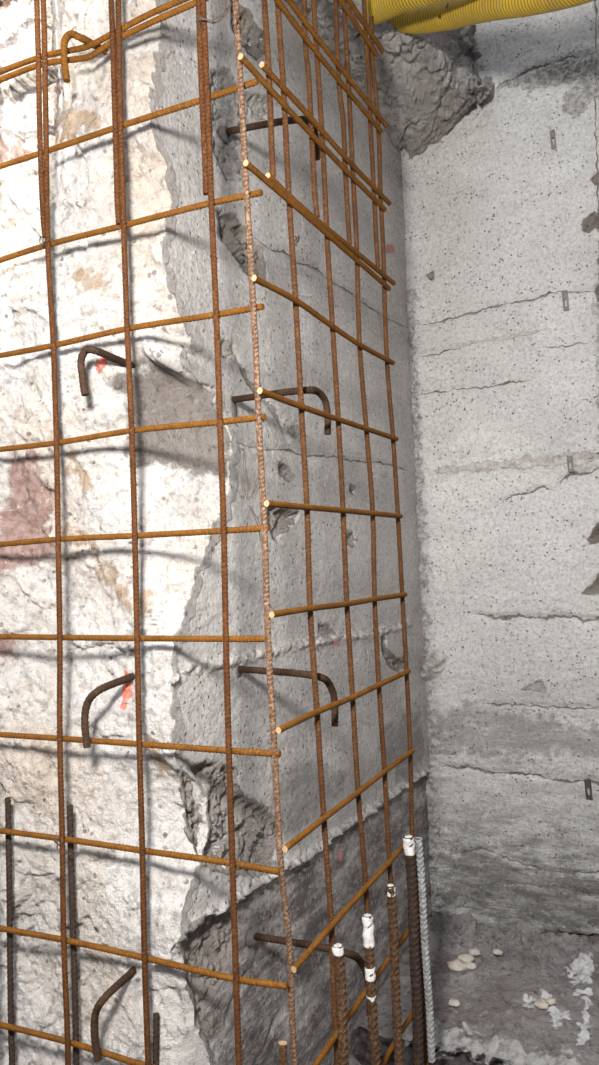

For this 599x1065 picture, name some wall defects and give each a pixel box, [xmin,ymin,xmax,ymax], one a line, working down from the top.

crack [256,0,599,328]
spalling [582,212,599,241]
spalling [0,0,415,1065]
crack [497,452,599,506]
leakage [433,953,599,1065]